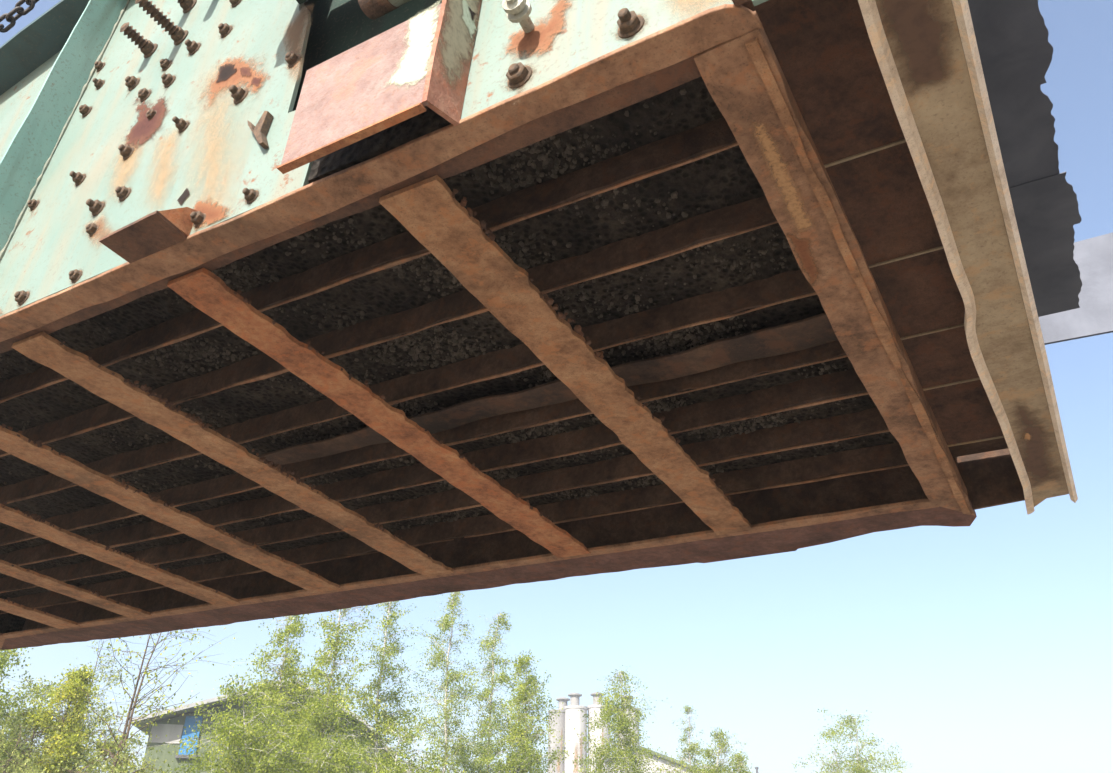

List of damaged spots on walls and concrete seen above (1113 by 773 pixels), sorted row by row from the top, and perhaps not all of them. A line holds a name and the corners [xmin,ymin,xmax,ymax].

rust [205,57,267,105]
peeling [388,0,480,86]
rust [506,0,571,57]
rust [119,97,168,184]